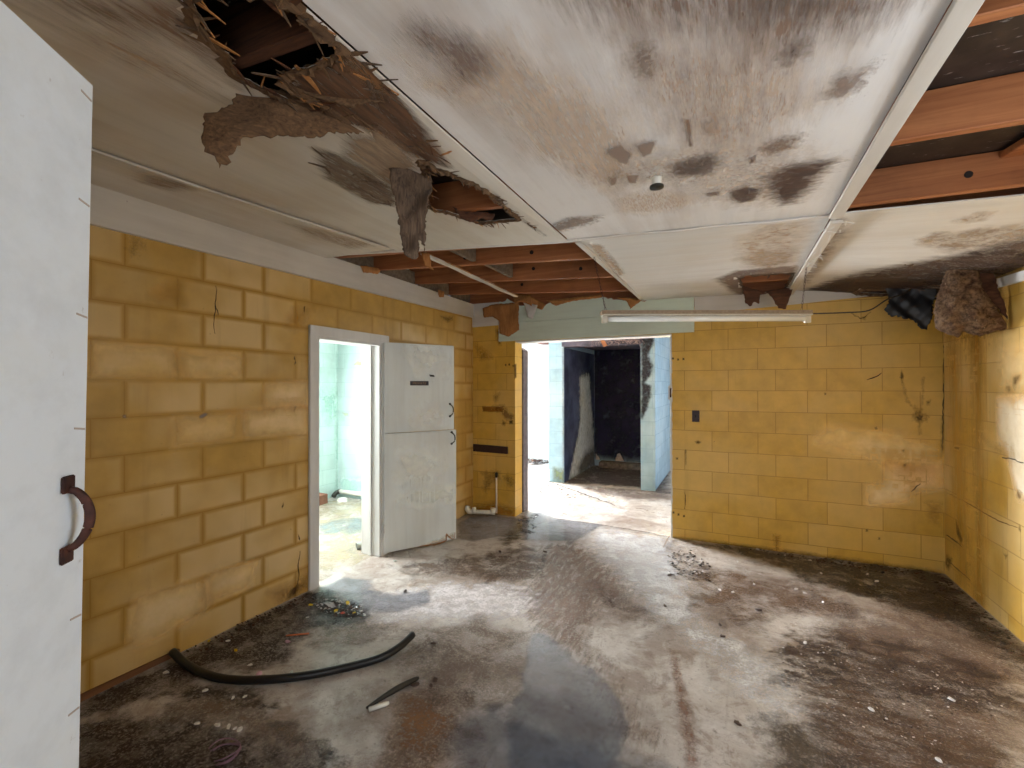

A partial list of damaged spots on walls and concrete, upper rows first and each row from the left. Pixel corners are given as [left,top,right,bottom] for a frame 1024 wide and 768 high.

peeling [175,0,240,61]
peeling [240,0,536,231]
damp [411,28,654,185]
damp [605,0,902,177]
damp [707,161,837,206]
damp [807,229,1024,294]